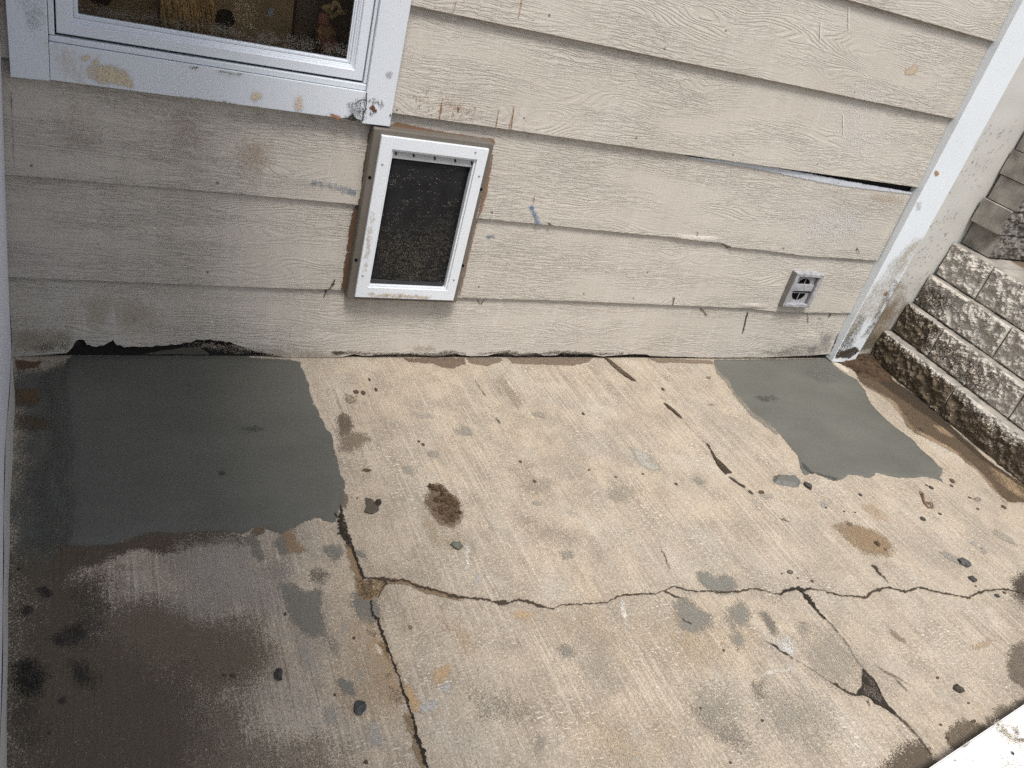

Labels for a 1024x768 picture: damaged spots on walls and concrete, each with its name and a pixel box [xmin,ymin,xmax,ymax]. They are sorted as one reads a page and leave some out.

peeling [345,97,391,122]
damp [763,235,1024,484]
damp [7,325,371,768]
damp [347,589,384,638]
crack [334,505,1024,768]